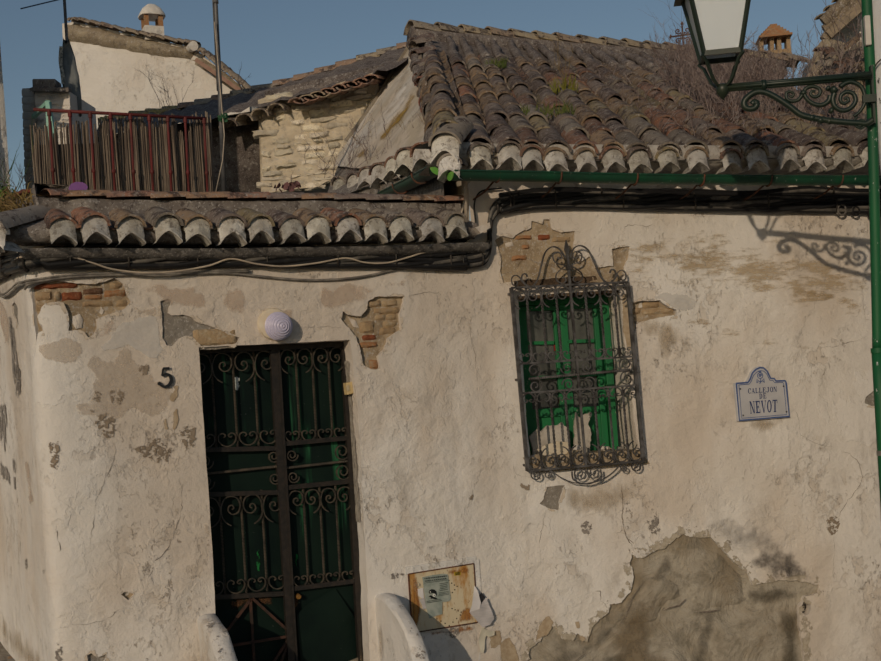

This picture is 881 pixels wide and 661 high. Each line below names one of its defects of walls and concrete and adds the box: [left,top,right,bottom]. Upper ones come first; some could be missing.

spalling [495,218,629,292]
spalling [30,277,133,340]
spalling [158,299,239,350]
spalling [339,293,404,370]
spalling [622,294,678,351]
peeling [164,385,196,449]
spalling [865,390,874,408]
peeling [135,438,174,463]
peeling [348,394,360,523]
spalling [540,485,566,512]
corrosion [459,608,472,632]
peeling [490,630,519,661]